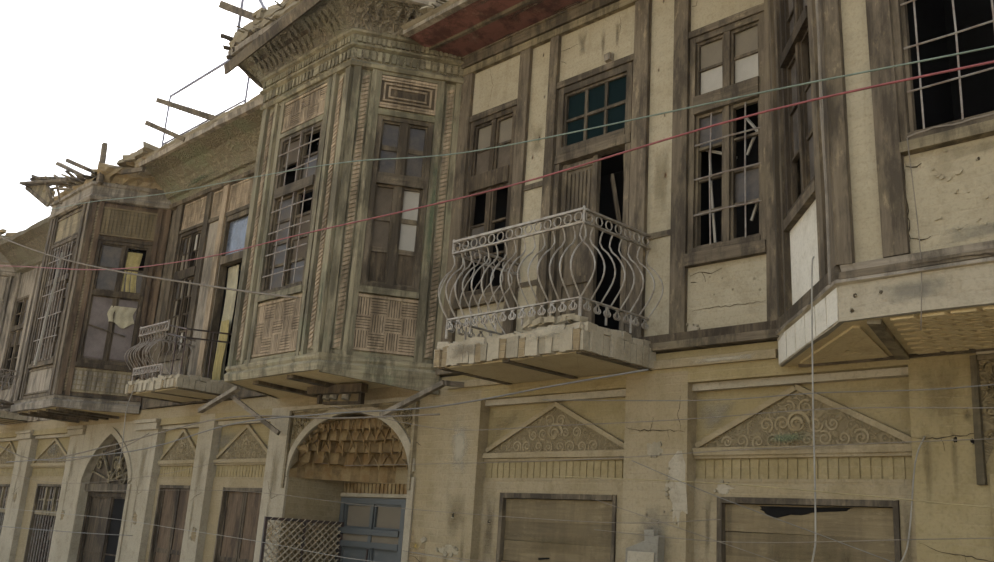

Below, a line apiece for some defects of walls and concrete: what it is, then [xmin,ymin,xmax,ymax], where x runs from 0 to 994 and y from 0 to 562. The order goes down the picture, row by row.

crack [905,163,994,265]
spalling [664,451,688,528]